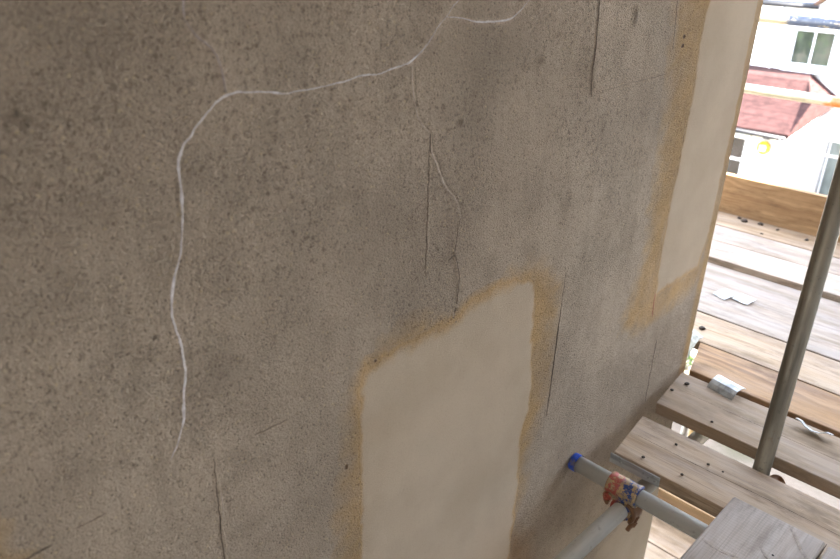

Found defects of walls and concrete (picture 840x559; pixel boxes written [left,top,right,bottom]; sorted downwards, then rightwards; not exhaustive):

crack [591,0,665,97]
crack [165,0,532,461]
crack [546,274,567,416]
crack [214,457,228,559]